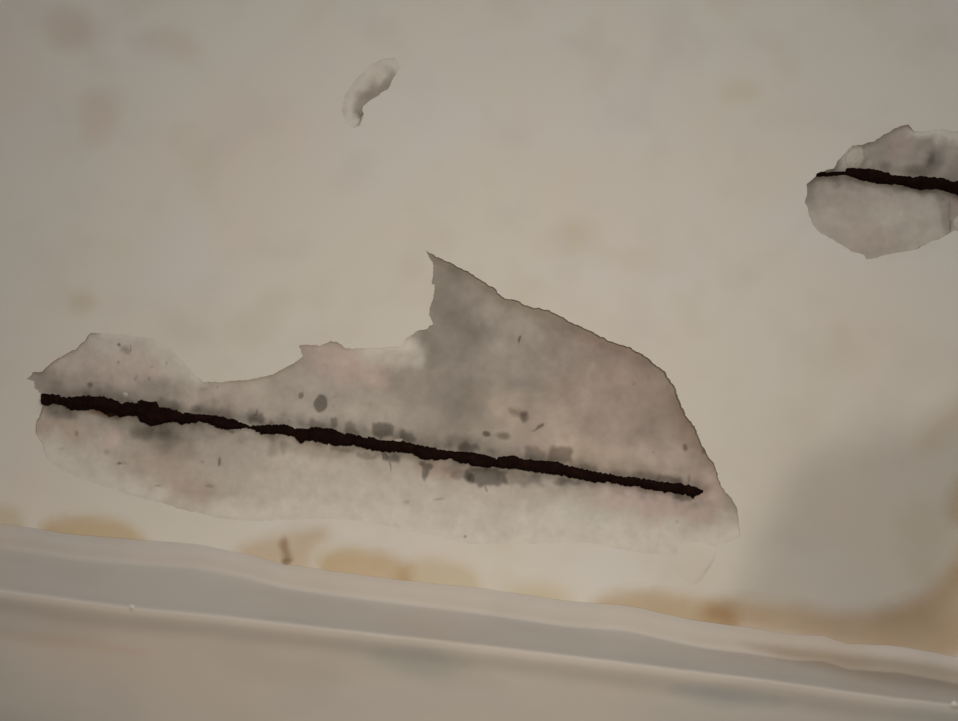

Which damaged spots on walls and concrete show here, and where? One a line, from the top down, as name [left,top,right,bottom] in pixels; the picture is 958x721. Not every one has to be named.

peeling [342,58,400,128]
spalling [805,125,958,259]
spalling [27,251,740,554]